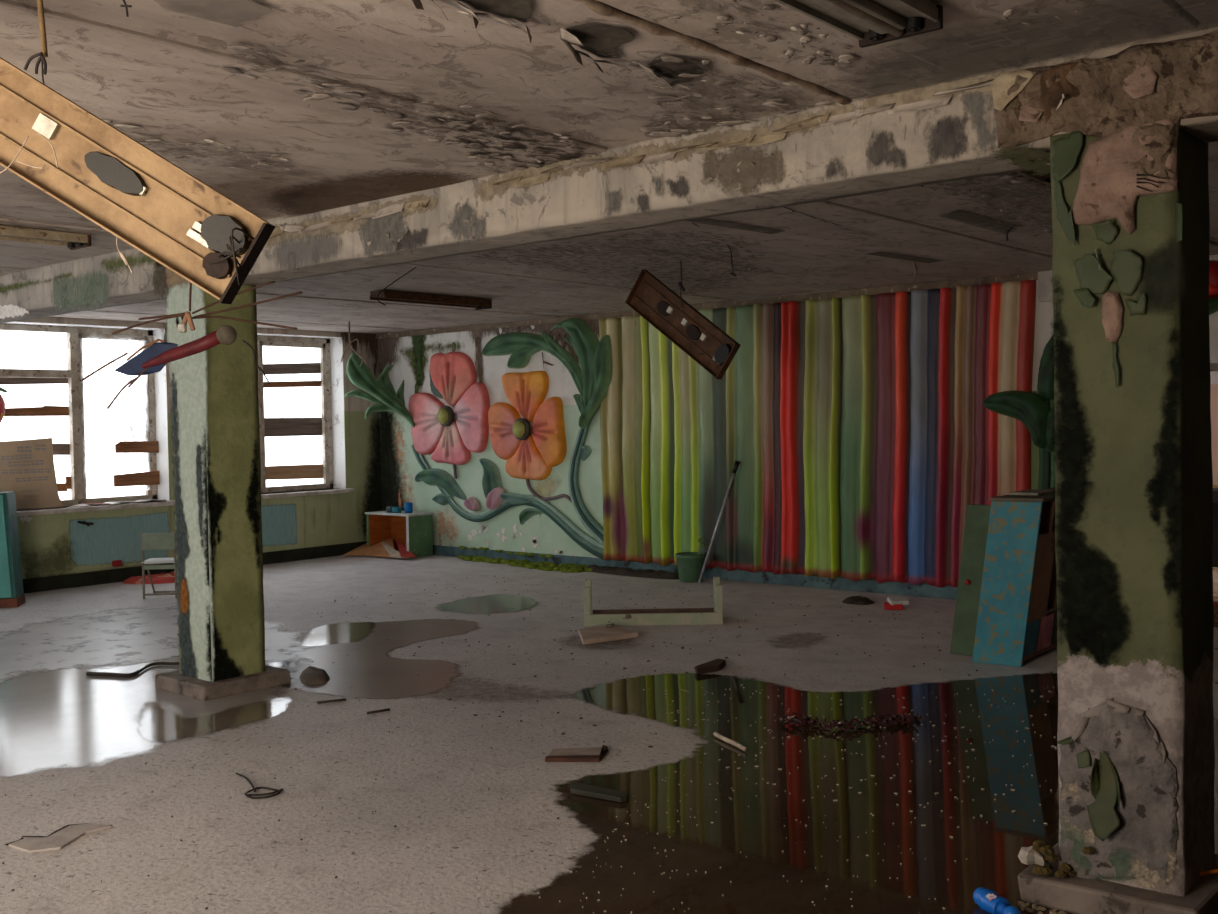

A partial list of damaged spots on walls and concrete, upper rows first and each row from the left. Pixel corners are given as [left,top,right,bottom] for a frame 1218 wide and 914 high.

peeling [411,0,533,43]
peeling [668,0,868,69]
water stain [214,170,470,217]
spalling [220,24,1218,388]
water stain [339,332,399,376]
water stain [152,262,243,682]
water stain [246,443,260,566]
water stain [362,411,405,537]
mould [1051,280,1130,667]
water stain [1147,329,1184,627]
spalling [1057,697,1179,885]